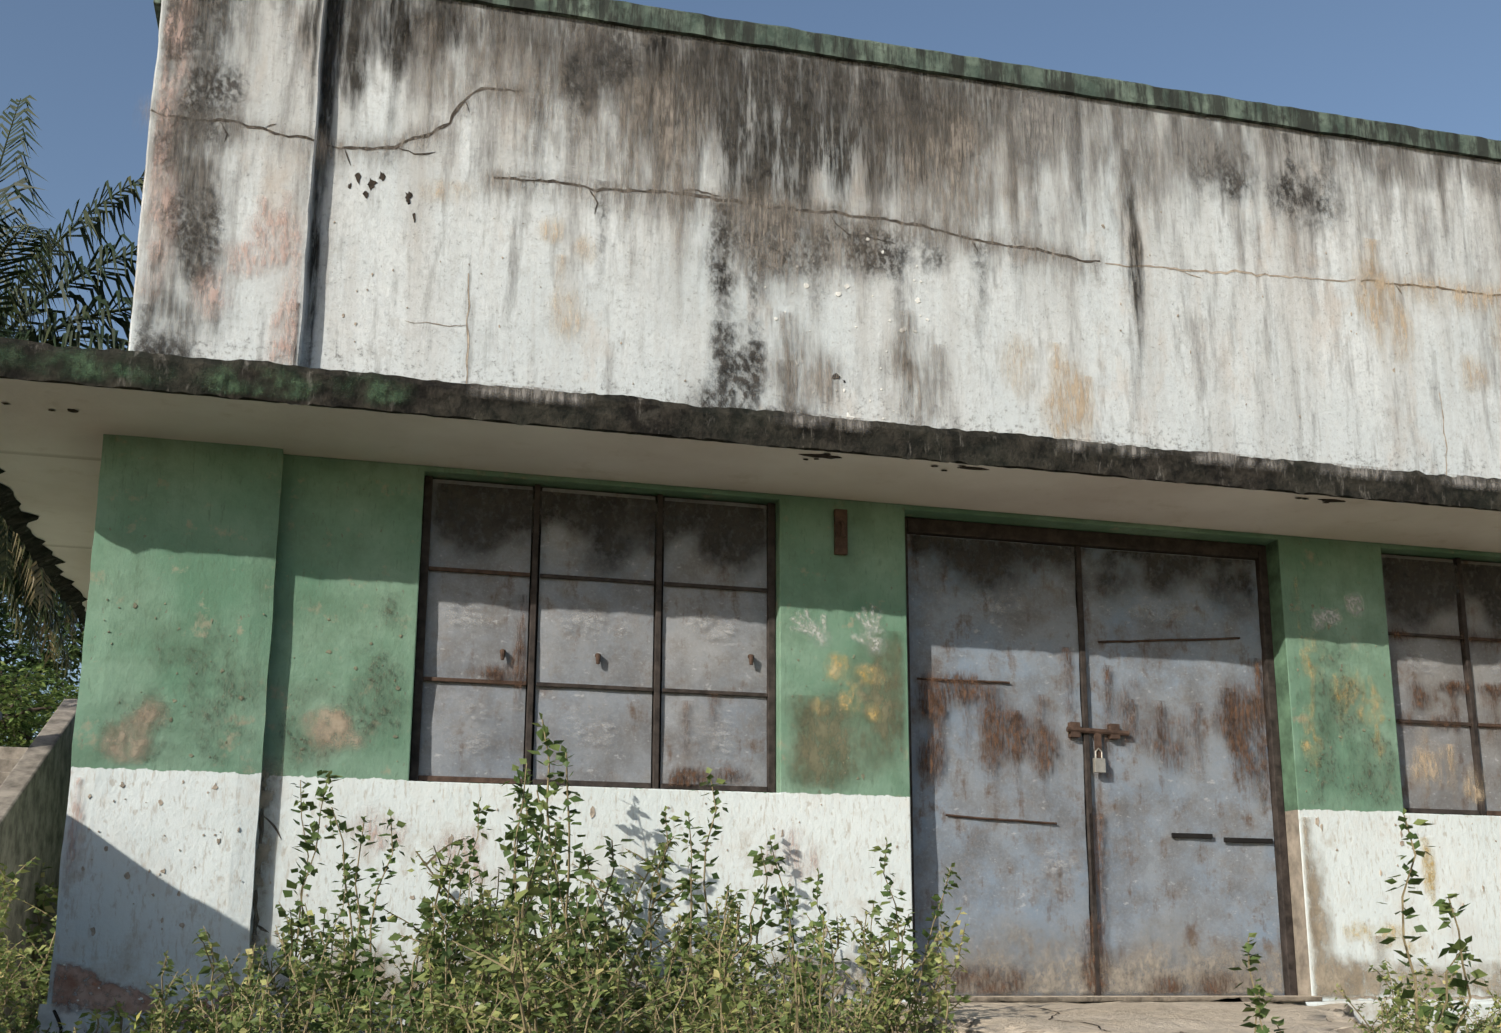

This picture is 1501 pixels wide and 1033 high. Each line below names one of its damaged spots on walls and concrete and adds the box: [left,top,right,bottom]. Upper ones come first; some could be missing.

water stain [160,184,220,283]
water stain [153,0,242,173]
crack [150,87,522,166]
water stain [303,0,984,299]
crack [486,172,1501,305]
water stain [1005,89,1248,316]
water stain [1271,165,1326,215]
water stain [481,386,583,403]
water stain [697,321,868,430]
corrosion [917,672,1058,777]
corrosion [1104,658,1266,784]
spalling [52,964,241,1027]